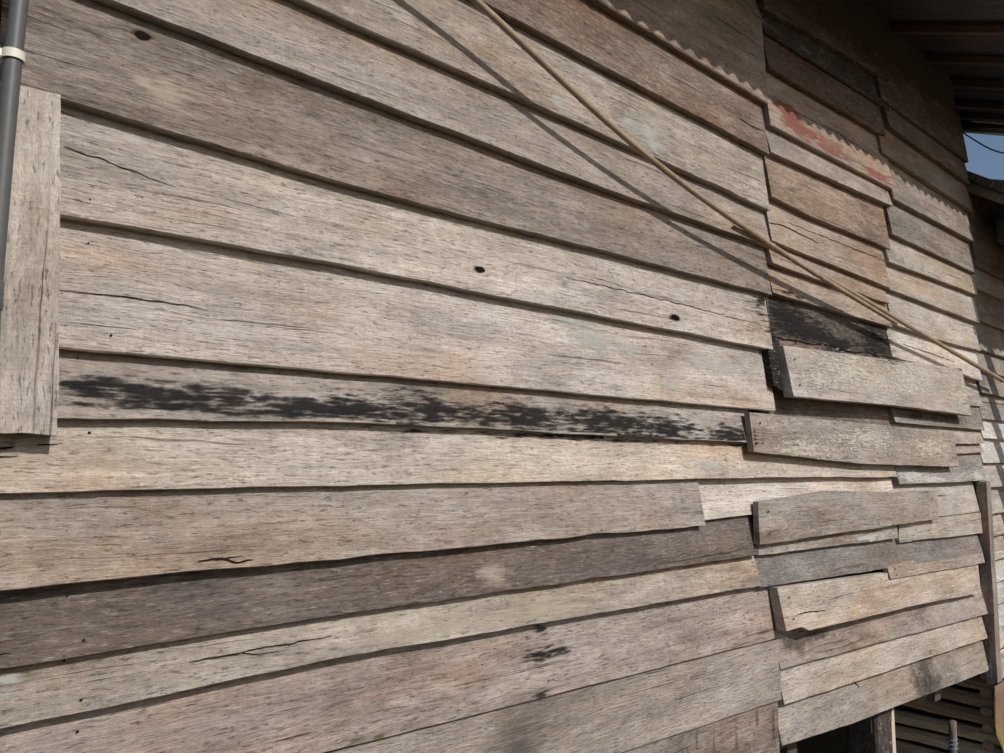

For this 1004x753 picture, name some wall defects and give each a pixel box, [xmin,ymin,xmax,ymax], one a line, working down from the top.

water stain [753,289,899,364]
water stain [59,375,759,447]
crack [198,556,253,564]
crack [190,635,332,662]